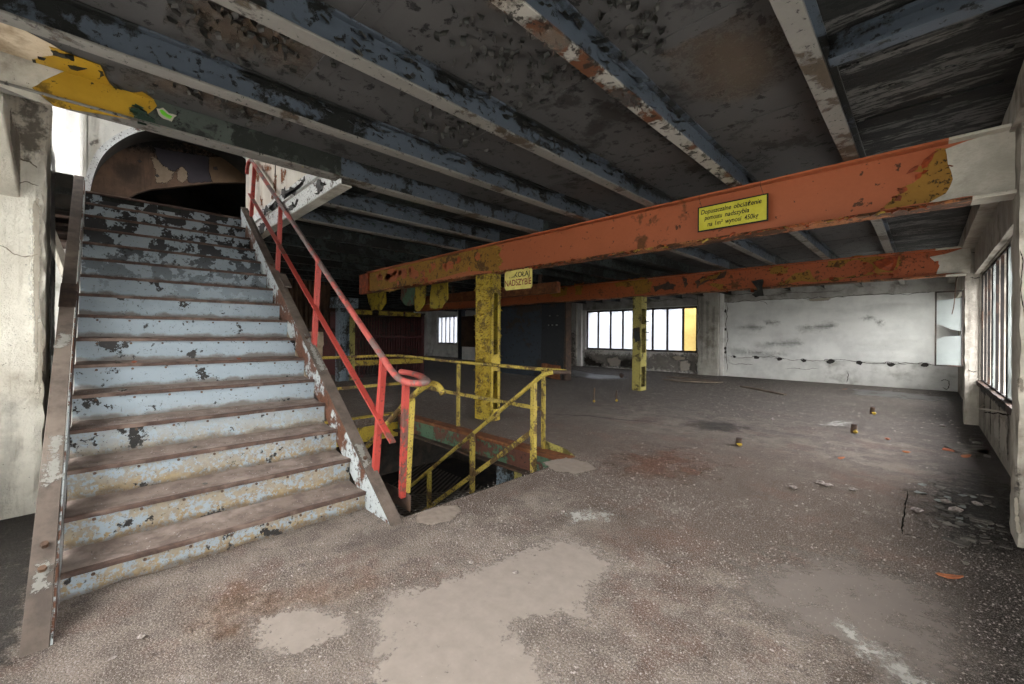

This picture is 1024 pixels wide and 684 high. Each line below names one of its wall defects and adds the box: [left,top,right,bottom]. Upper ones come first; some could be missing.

peeling [32,50,122,90]
peeling [538,0,691,132]
peeling [129,104,177,127]
peeling [386,4,653,213]
peeling [125,140,241,183]
peeling [258,176,326,235]
peeling [870,148,953,216]
crack [901,491,924,540]